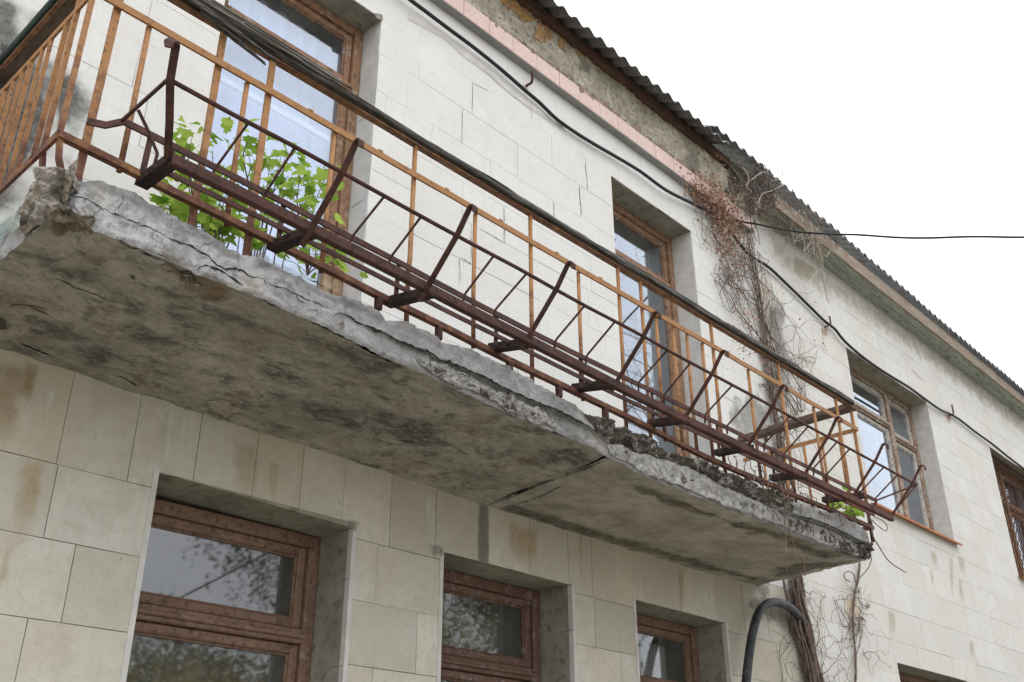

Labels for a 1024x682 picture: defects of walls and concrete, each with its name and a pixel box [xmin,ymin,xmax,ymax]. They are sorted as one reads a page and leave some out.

water stain [0,0,19,56]
water stain [0,63,89,206]
spalling [1,156,96,242]
spalling [480,0,691,171]
crack [55,278,112,302]
crack [71,195,608,520]
spalling [417,357,557,428]
spalling [584,414,875,561]